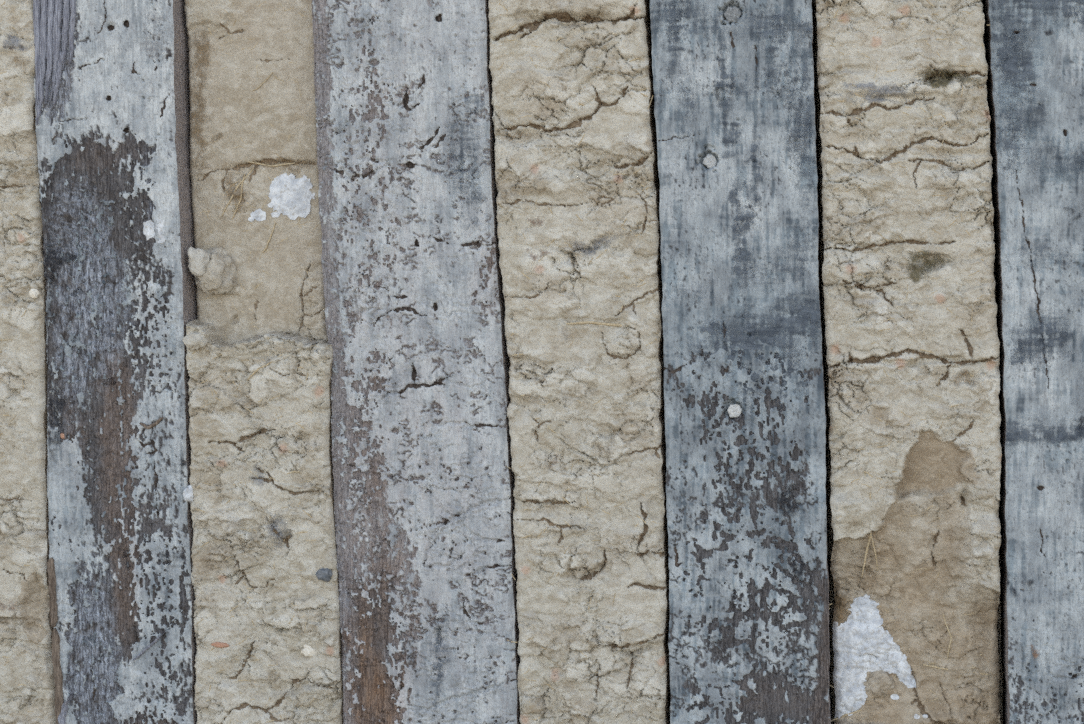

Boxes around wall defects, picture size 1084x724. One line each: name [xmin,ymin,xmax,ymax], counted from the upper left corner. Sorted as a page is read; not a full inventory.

crack [495,5,645,41]
crack [501,86,628,133]
crack [821,66,989,188]
crack [826,240,955,251]
crack [842,280,897,305]
spalling [41,0,514,724]
crack [830,330,997,386]
peeling [670,338,819,493]
crack [513,499,584,543]
crack [628,504,687,591]
spalling [673,420,1001,724]
crack [590,633,664,697]